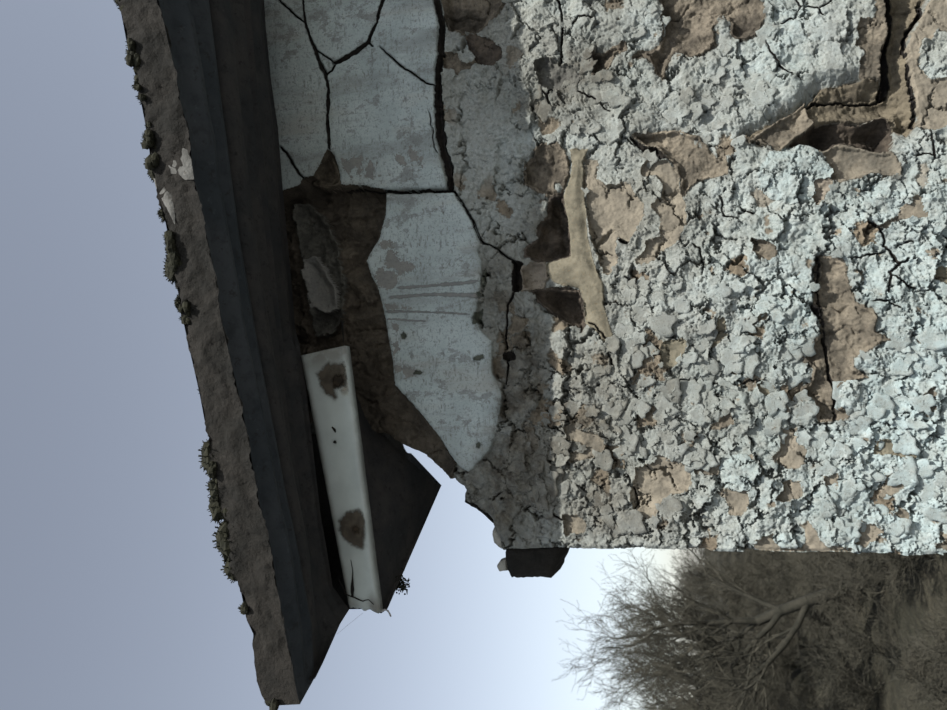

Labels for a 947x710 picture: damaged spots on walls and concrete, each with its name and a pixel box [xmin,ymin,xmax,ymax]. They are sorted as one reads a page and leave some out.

spalling [441,0,510,81]
crack [557,0,592,65]
crack [765,42,801,80]
crack [780,0,832,24]
crack [805,0,938,160]
crack [279,0,518,385]
spalling [283,149,457,479]
peeling [507,0,947,552]
crack [810,258,836,421]
corrosion [317,363,346,399]
corrosion [338,509,365,549]